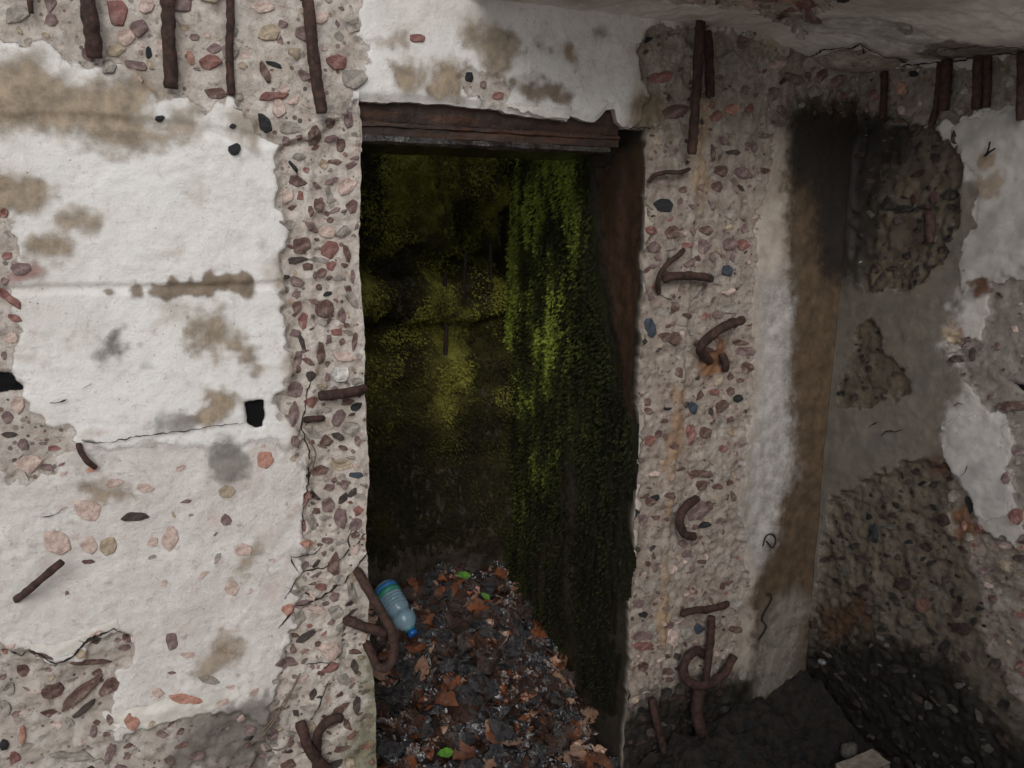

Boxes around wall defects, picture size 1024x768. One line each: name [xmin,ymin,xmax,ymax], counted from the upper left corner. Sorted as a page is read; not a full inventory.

water stain [0,56,200,151]
water stain [392,61,467,105]
water stain [464,21,572,103]
water stain [0,175,47,212]
water stain [11,210,100,281]
water stain [130,270,254,301]
flaking render [0,0,400,768]
spalling [623,0,1024,768]
crack [81,422,244,444]
water stain [623,94,1024,768]
crack [278,378,370,629]